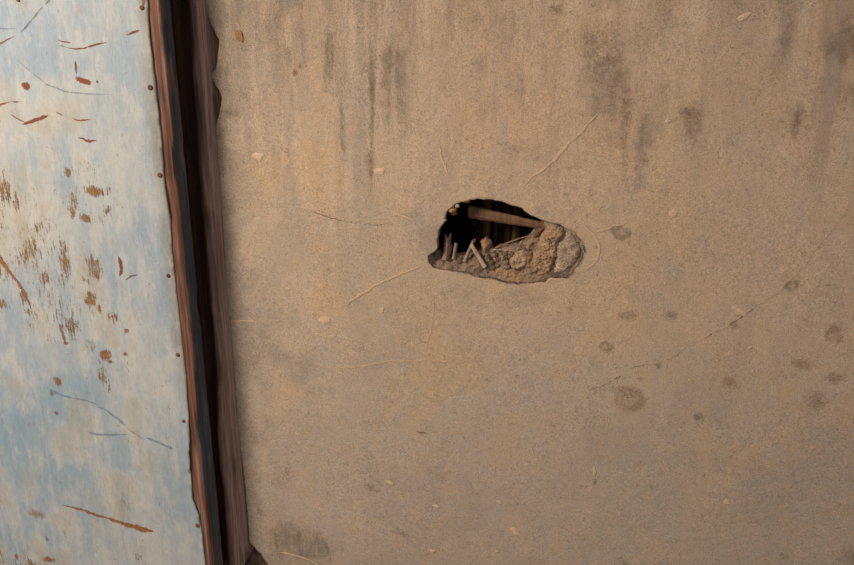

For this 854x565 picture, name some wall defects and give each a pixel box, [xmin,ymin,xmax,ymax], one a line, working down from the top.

corrosion [0,171,19,210]
corrosion [67,186,110,223]
hole [429,199,585,285]
corrosion [0,222,73,323]
corrosion [52,255,117,345]
corrosion [91,347,112,392]
corrosion [63,505,154,532]